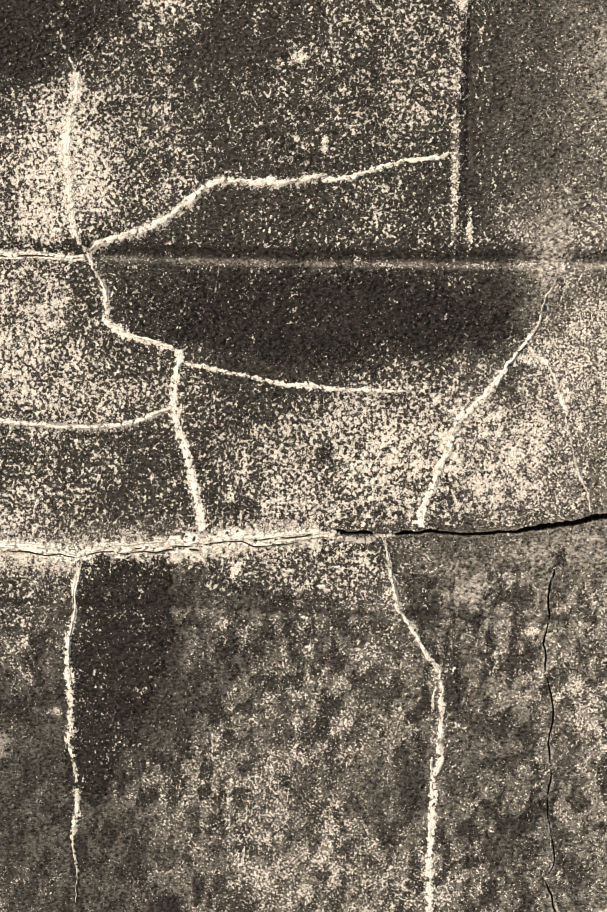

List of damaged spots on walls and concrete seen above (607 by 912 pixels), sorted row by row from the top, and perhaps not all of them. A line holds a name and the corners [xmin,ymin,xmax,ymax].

crack [0,54,450,534]
crack [0,278,607,912]